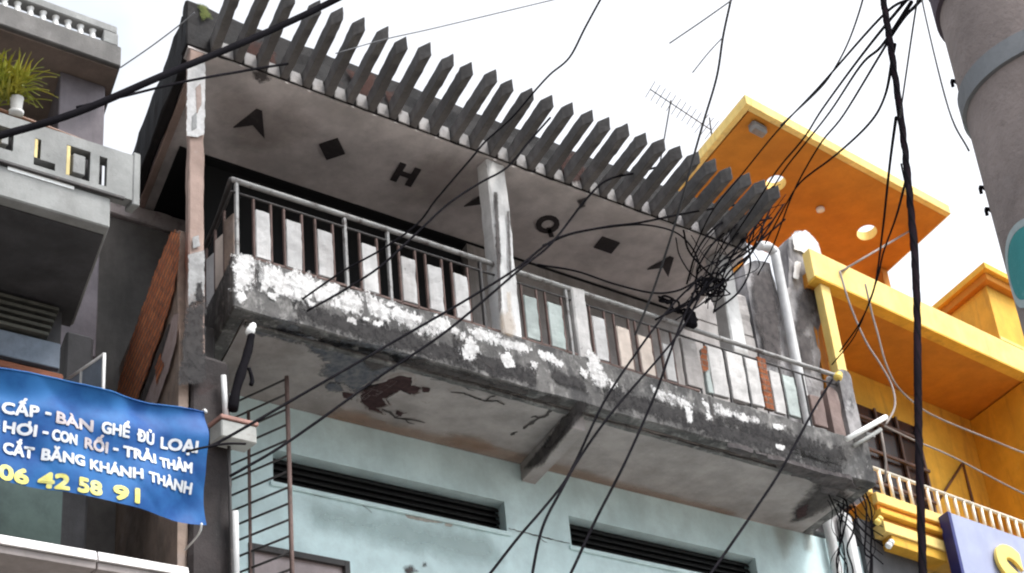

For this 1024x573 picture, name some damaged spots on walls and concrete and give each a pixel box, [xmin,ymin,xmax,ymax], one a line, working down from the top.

peeling [232,251,564,368]
flaking render [342,372,430,416]
crack [430,336,505,405]
crack [510,410,552,436]
leakage [254,288,847,474]
peeling [651,385,760,424]
leakage [791,484,848,522]